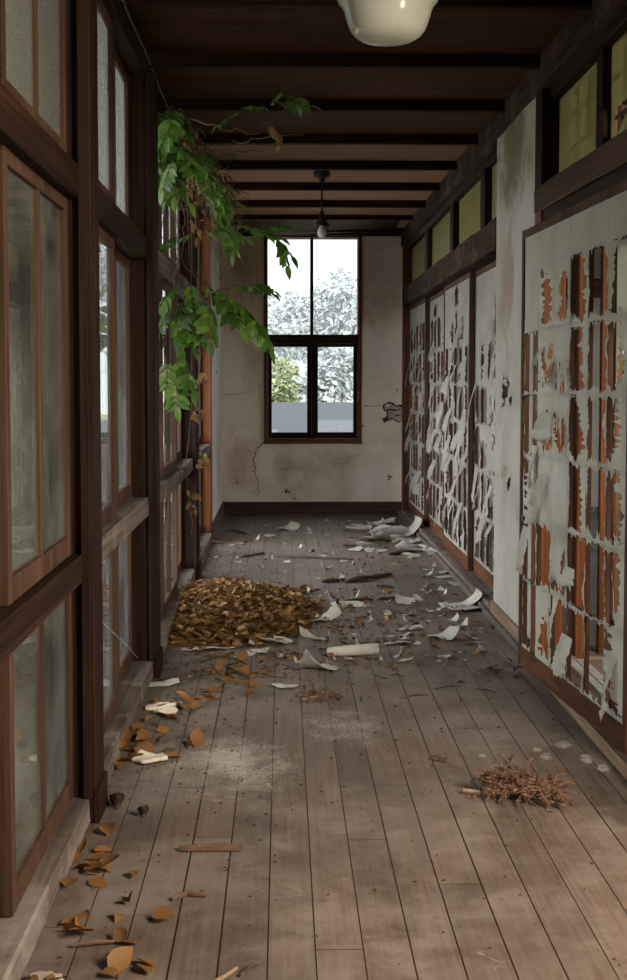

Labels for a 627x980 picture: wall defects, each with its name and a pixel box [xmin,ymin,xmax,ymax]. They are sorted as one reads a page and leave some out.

spalling [382,402,402,424]